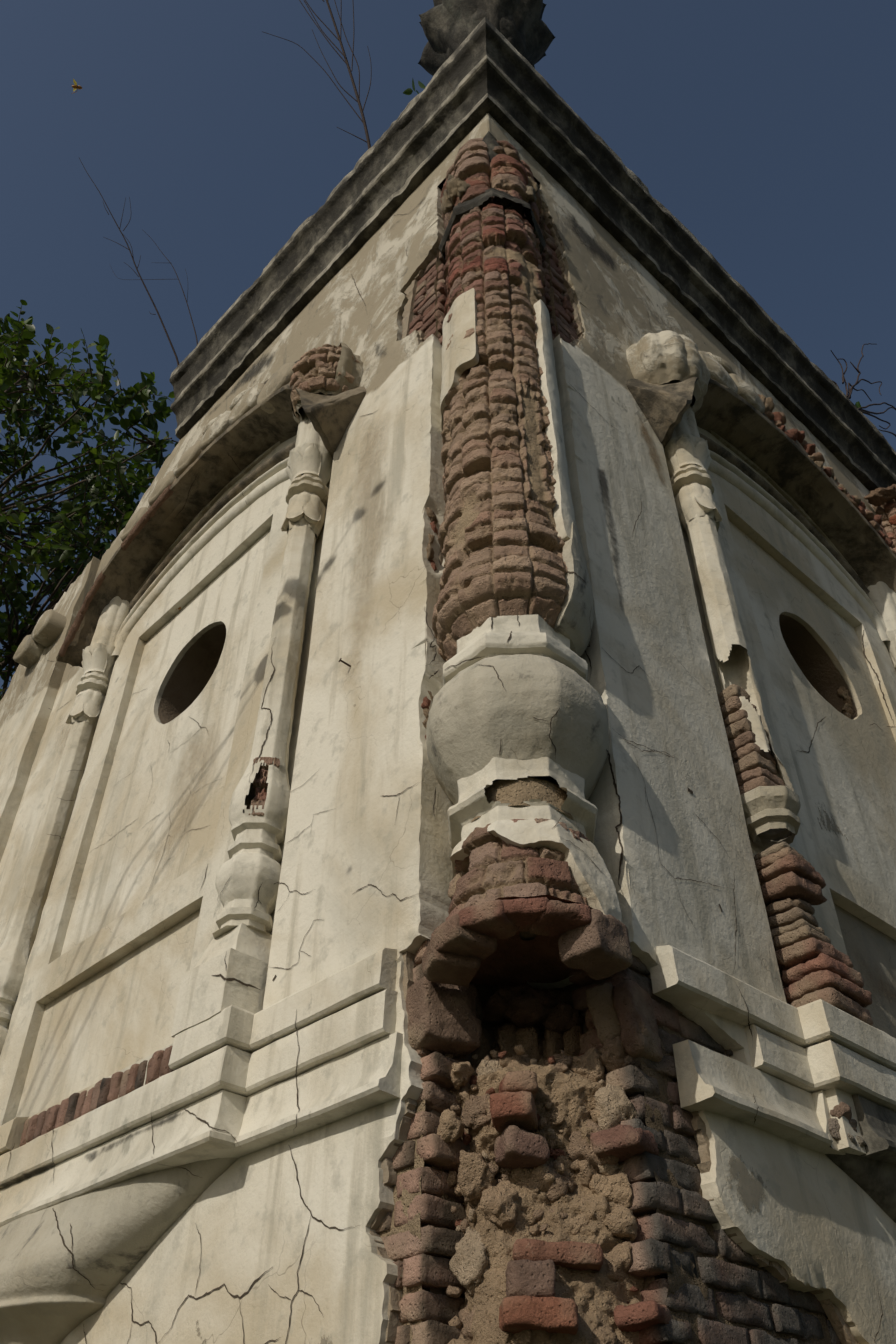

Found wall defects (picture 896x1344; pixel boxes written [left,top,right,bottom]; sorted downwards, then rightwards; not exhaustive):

spalling [290,344,360,419]
spalling [402,138,579,662]
spalling [758,394,896,555]
spalling [837,686,854,719]
crack [48,637,276,903]
spalling [247,757,280,816]
crack [199,864,322,990]
crack [352,884,421,901]
spalling [19,1046,175,1147]
spalling [375,777,842,1344]
crack [51,1009,359,1344]